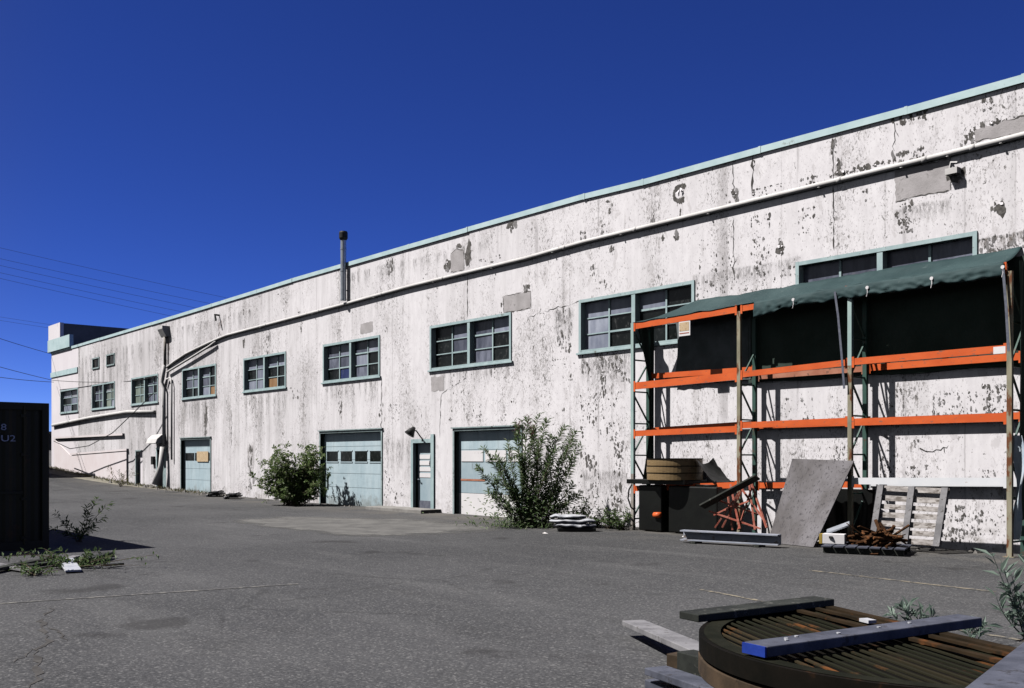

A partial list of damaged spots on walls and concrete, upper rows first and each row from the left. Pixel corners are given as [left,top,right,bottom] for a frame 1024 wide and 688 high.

peeling [800,138,966,233]
spalling [990,200,1006,218]
peeling [444,240,501,272]
crack [502,291,578,317]
peeling [552,308,630,512]
peeling [932,383,1007,415]